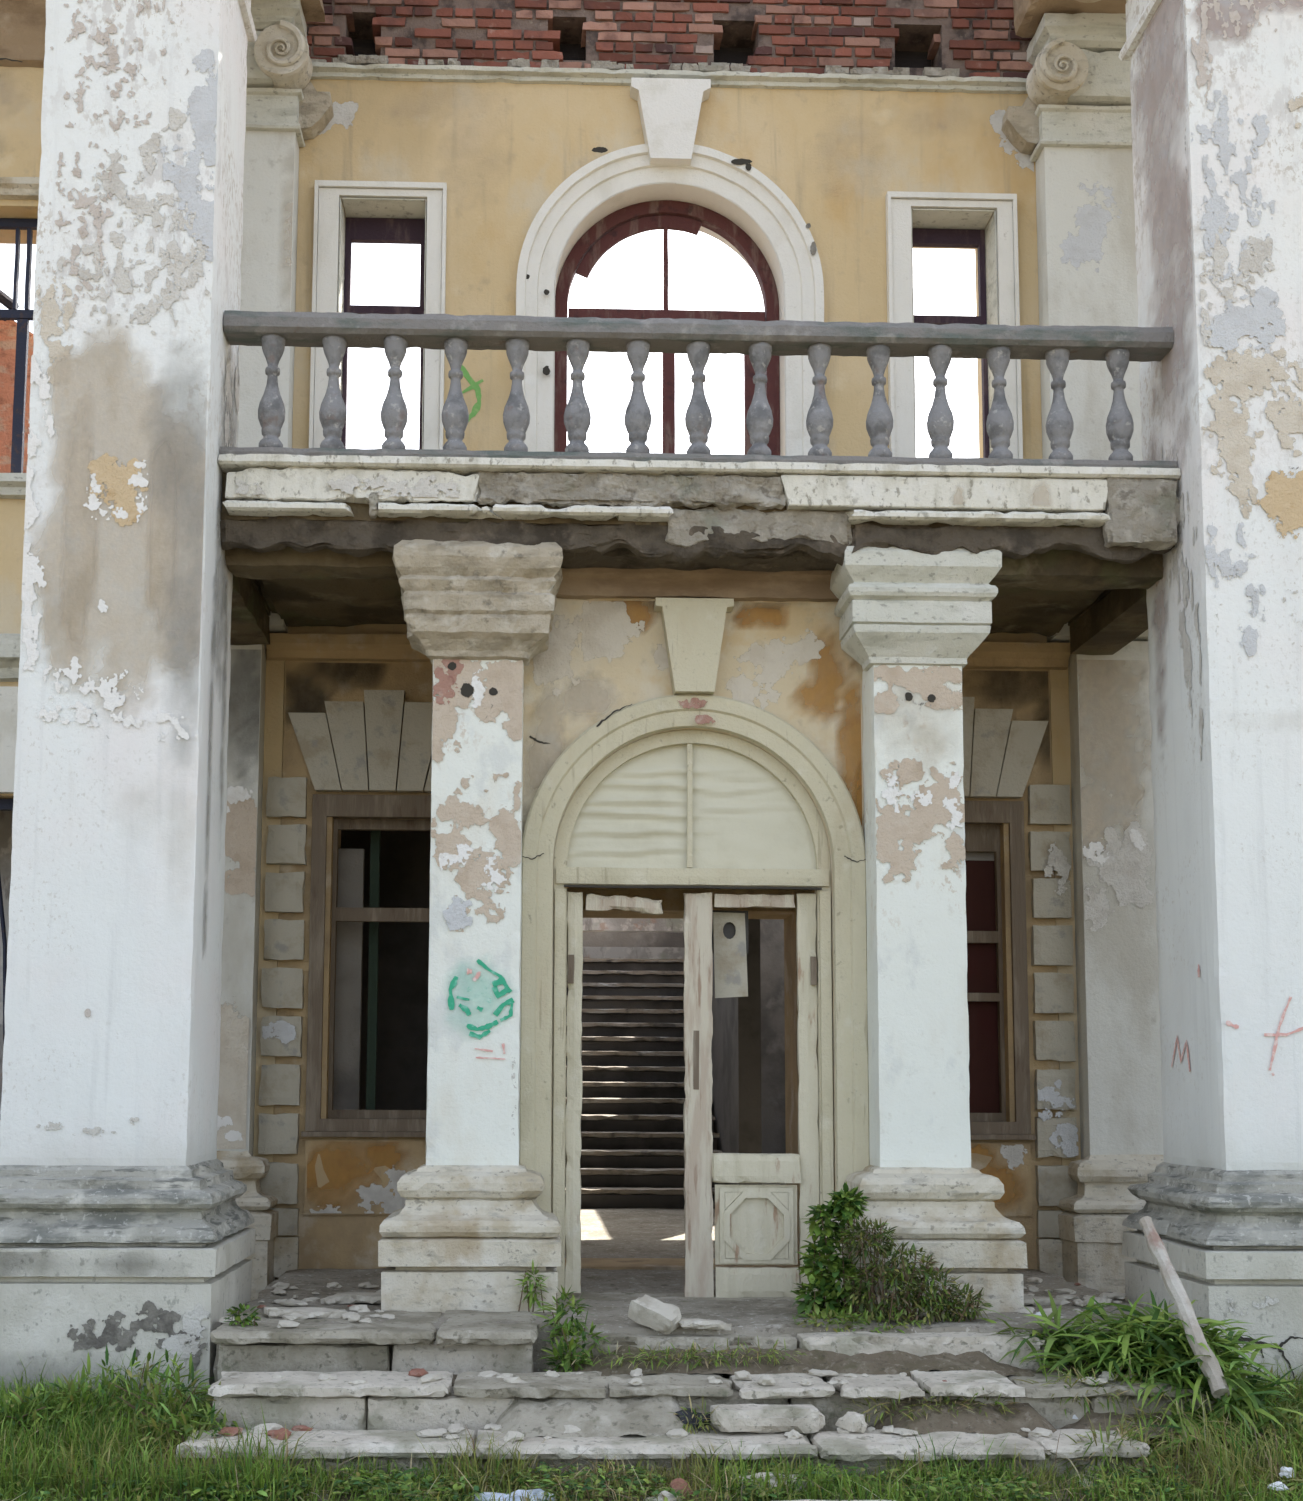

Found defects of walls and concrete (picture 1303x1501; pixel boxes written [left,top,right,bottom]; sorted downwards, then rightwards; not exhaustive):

peeling [21,0,218,751]
peeling [1102,0,1303,761]
peeling [327,474,478,519]
peeling [874,665,963,714]
peeling [431,772,522,932]
peeling [875,758,966,883]
spalling [67,1301,209,1371]